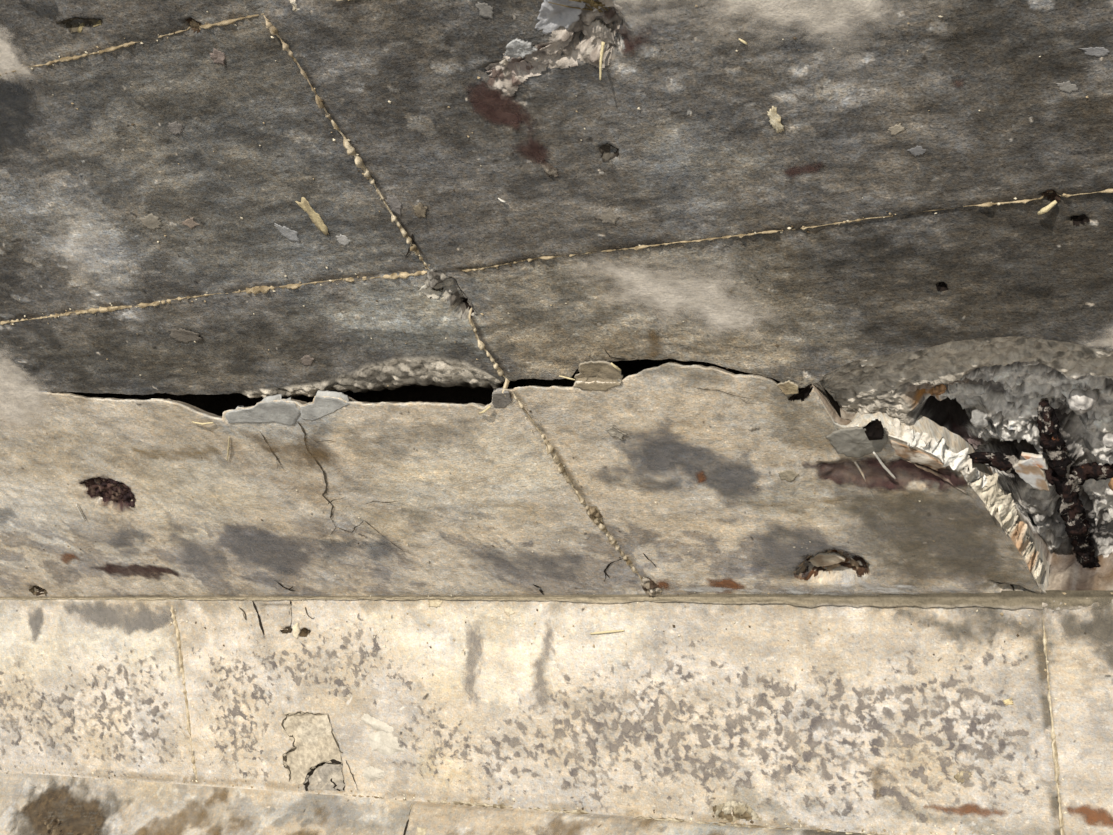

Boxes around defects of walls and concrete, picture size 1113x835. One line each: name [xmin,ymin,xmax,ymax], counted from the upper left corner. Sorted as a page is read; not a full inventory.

spalling [475,2,494,20]
spalling [485,0,624,97]
rust [469,81,547,163]
crack [605,350,841,417]
crack [51,354,580,554]
spalling [809,336,1113,592]
rust [96,564,178,579]
crack [604,553,656,583]
spalling [793,548,869,580]
damp [11,780,119,835]
rust [925,804,1002,816]
rust [1067,806,1113,826]